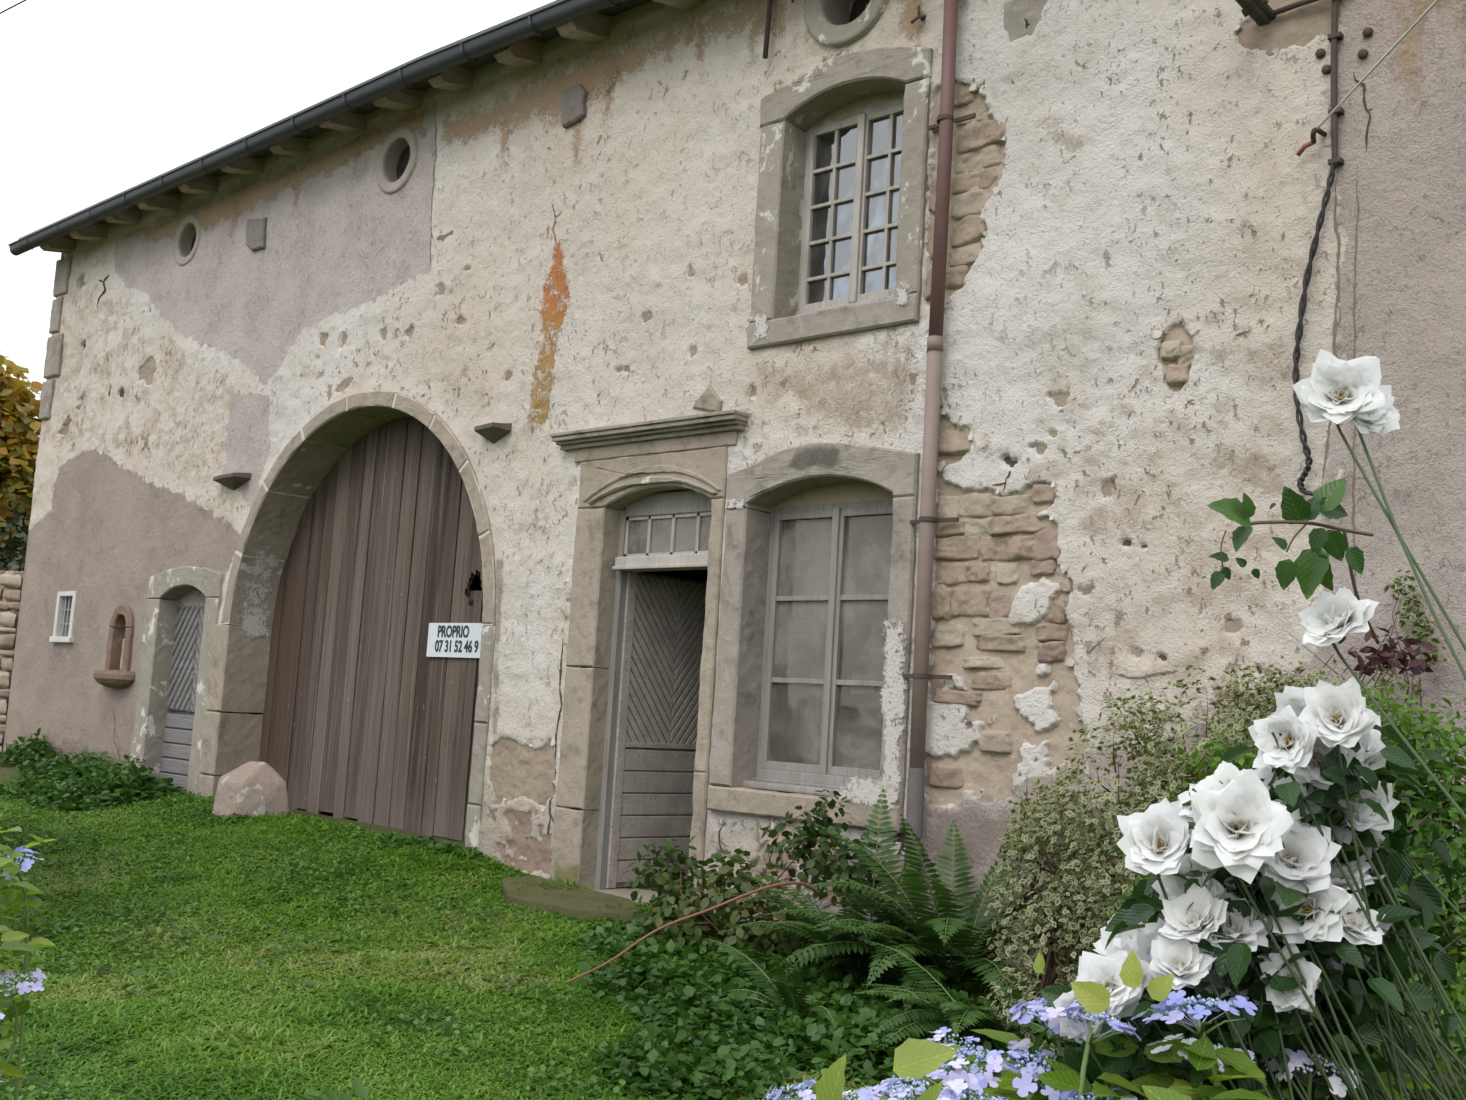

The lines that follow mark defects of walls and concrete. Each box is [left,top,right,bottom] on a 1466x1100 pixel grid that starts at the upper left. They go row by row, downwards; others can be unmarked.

spalling [1003,0,1048,42]
spalling [1234,0,1340,58]
crack [97,274,110,305]
corrosion [529,226,570,440]
spalling [139,357,157,385]
spalling [1152,327,1200,397]
spalling [1049,393,1070,407]
spalling [1031,431,1058,455]
spalling [1077,582,1095,595]
spalling [487,738,556,875]